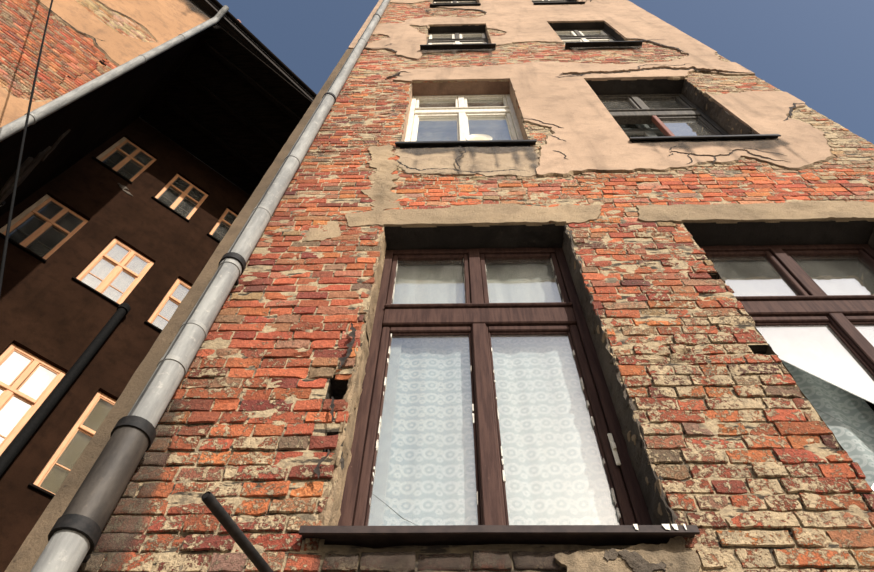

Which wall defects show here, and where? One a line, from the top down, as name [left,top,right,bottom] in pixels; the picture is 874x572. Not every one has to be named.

flaking render [75,0,158,42]
flaking render [367,0,486,43]
flaking render [0,0,119,102]
flaking render [391,26,689,73]
crack [559,38,748,78]
flaking render [668,69,783,135]
crack [523,117,567,159]
flaking render [520,104,874,178]
crack [666,147,790,164]
spalling [318,231,387,526]
spalling [555,225,701,572]